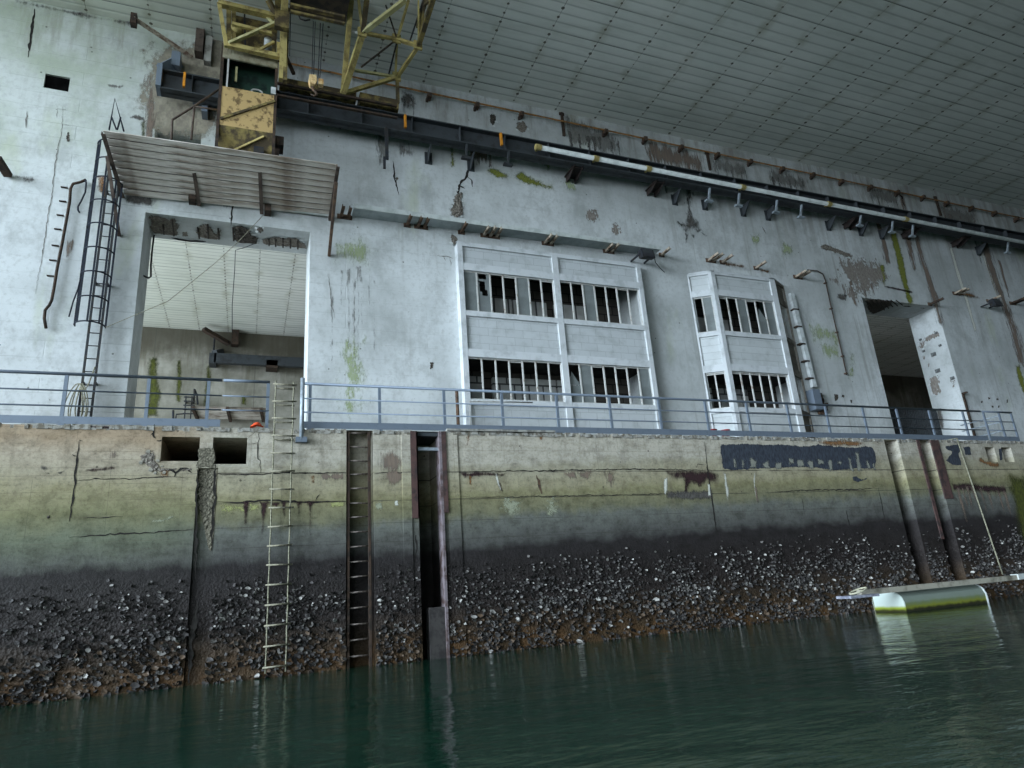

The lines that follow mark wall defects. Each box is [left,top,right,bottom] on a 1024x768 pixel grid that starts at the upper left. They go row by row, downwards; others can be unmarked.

crack [457,171,473,194]
peeling [821,243,903,314]
corrosion [975,241,1024,367]
peeling [918,331,955,397]
spalling [139,448,218,551]
crack [69,432,345,574]
corrosion [243,501,314,523]
leakage [384,452,401,485]
leakage [461,472,521,514]
leakage [664,471,728,500]